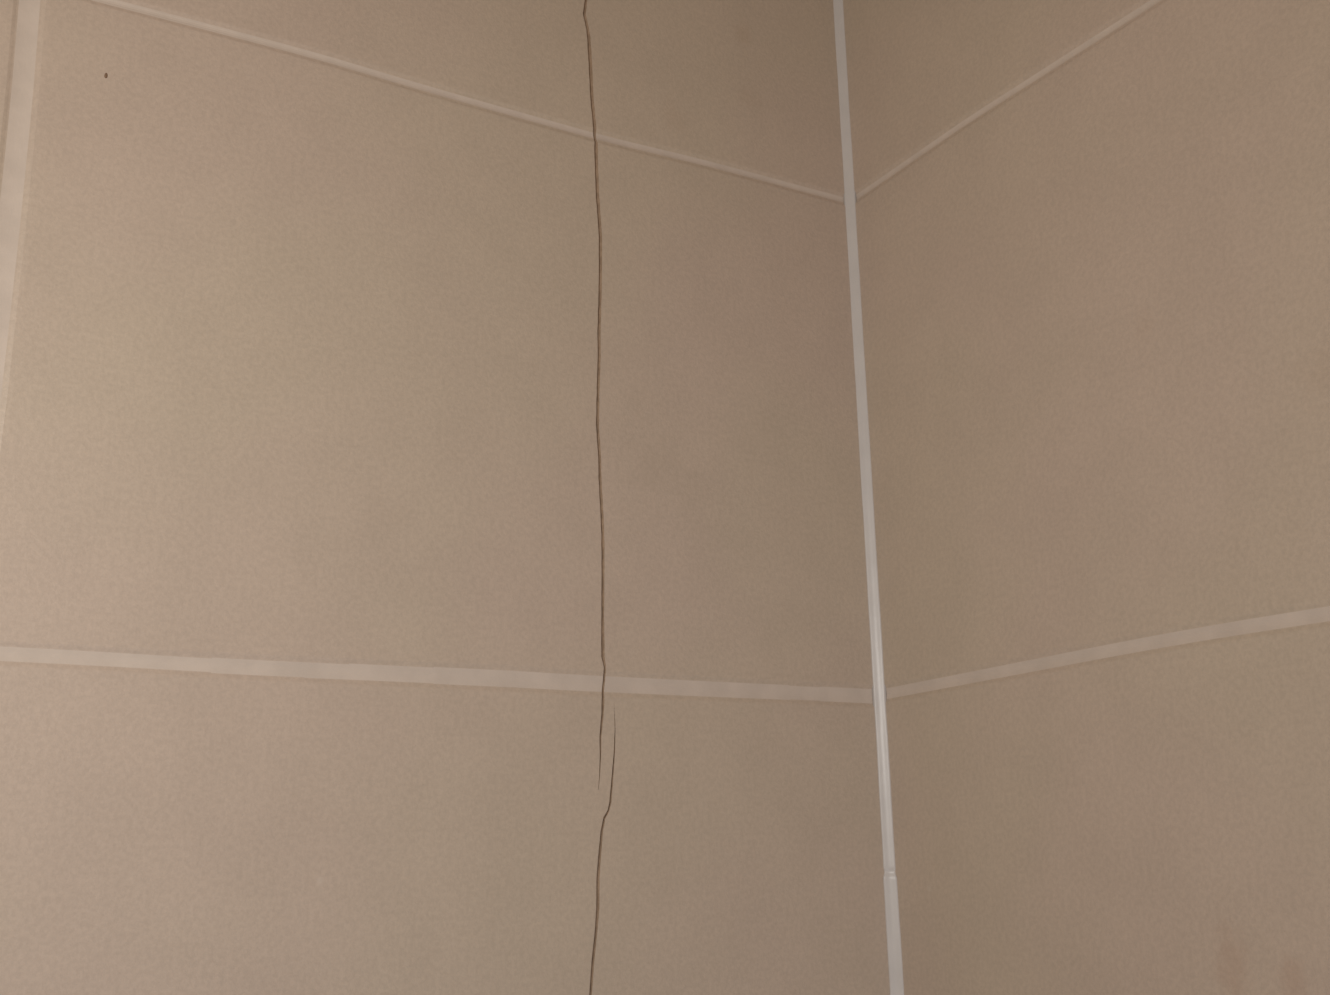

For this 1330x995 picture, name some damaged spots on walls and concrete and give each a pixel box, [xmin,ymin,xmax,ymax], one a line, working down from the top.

crack [583,0,615,995]